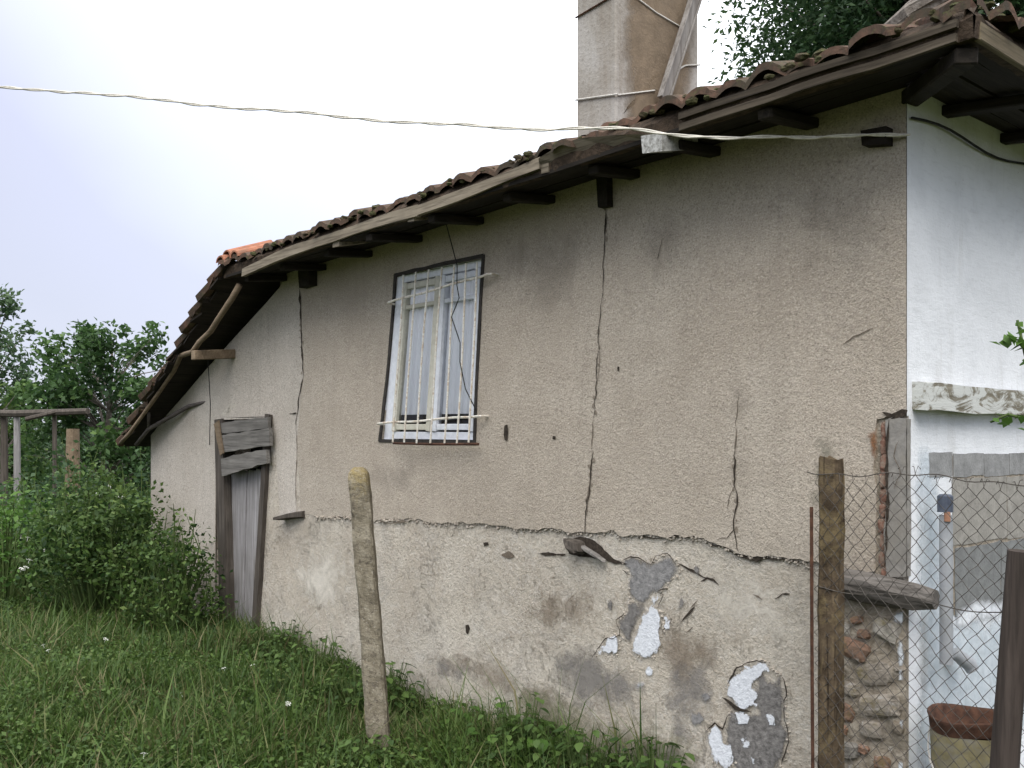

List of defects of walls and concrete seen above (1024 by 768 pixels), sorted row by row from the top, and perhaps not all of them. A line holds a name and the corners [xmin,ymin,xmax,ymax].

crack [290,290,304,504]
crack [585,208,608,523]
crack [540,550,565,558]
crack [602,556,626,565]
spalling [592,553,709,686]
crack [638,396,803,564]
flaking render [874,419,888,576]
spalling [691,659,792,768]